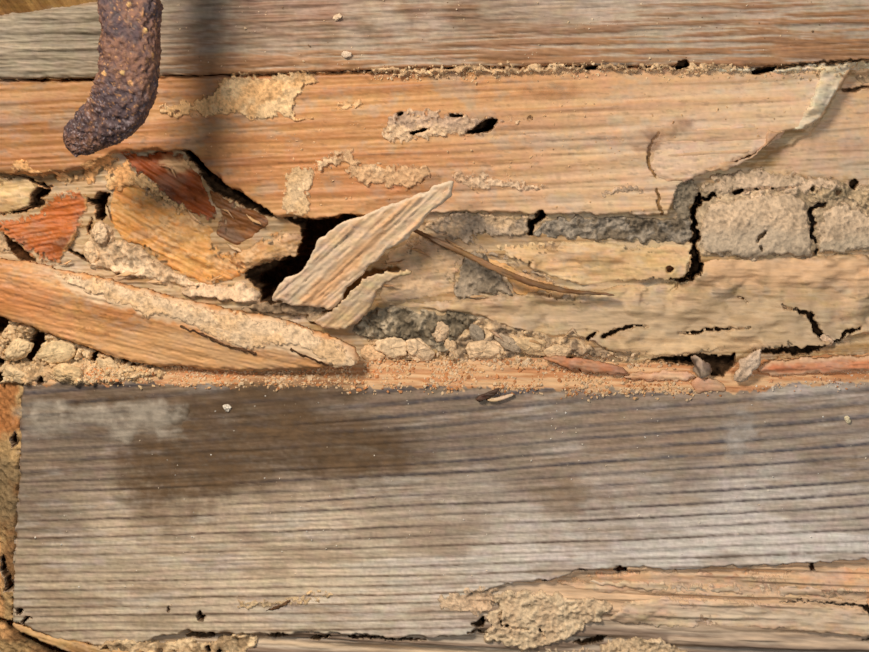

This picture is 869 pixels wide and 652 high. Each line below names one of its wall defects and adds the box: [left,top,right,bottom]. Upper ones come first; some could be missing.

corrosion [63,0,164,157]
peeling [0,176,87,265]
spalling [181,149,357,305]
peeling [691,355,712,378]
peeling [733,348,761,382]
crack [779,598,869,613]